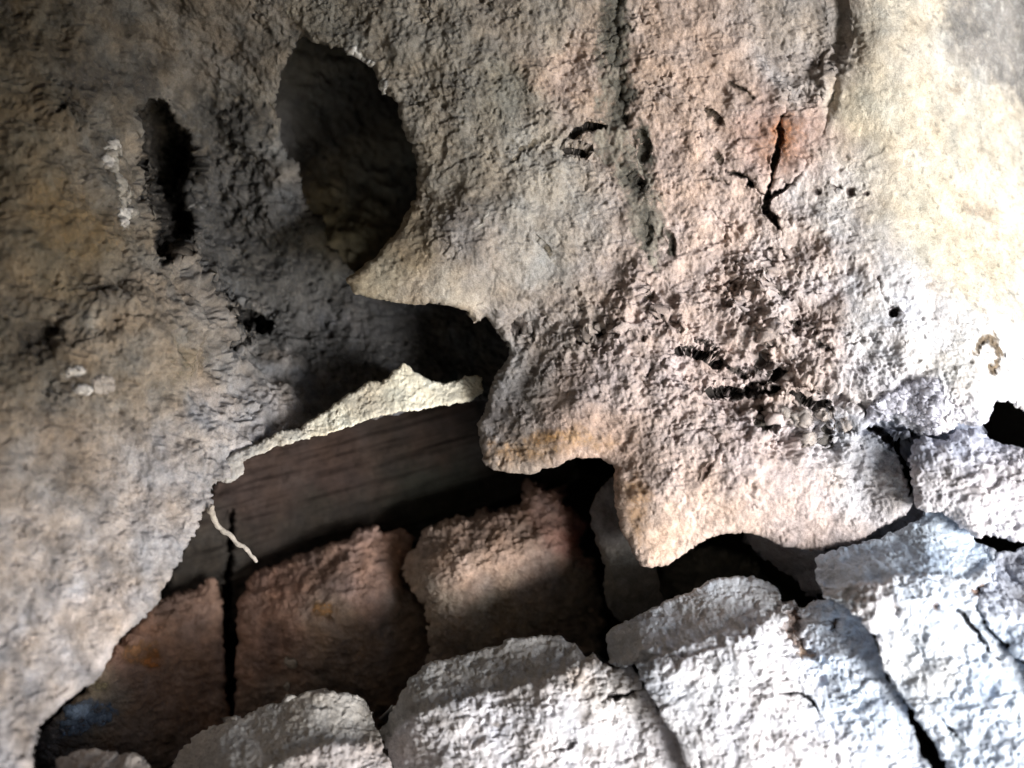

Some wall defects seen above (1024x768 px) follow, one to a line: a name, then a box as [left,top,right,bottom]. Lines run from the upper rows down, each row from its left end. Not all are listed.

peeling [344,46,375,67]
peeling [378,79,387,95]
crack [729,81,754,99]
crack [704,108,723,124]
crack [511,94,651,194]
corrosion [756,115,806,162]
crack [711,116,789,229]
crack [538,239,553,257]
crack [643,222,675,257]
crack [787,320,831,351]
crack [674,338,835,430]